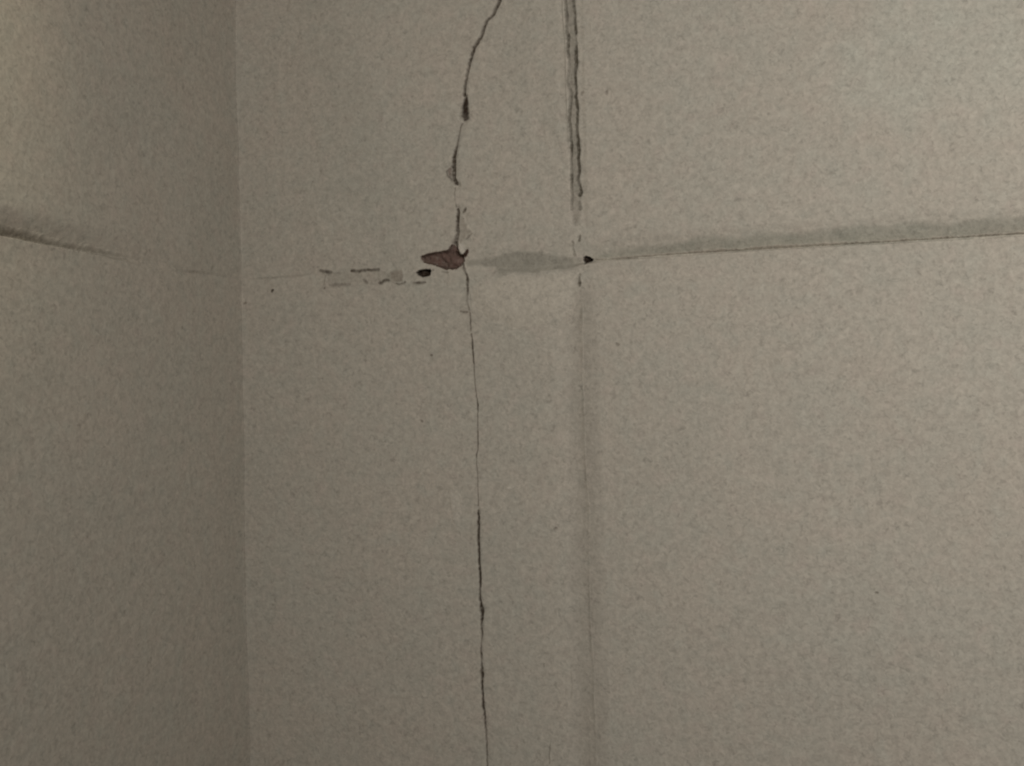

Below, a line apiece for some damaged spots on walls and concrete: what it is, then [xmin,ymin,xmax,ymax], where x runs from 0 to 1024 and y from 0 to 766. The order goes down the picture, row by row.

crack [562,0,584,211]
spalling [319,241,469,289]
crack [446,0,503,766]